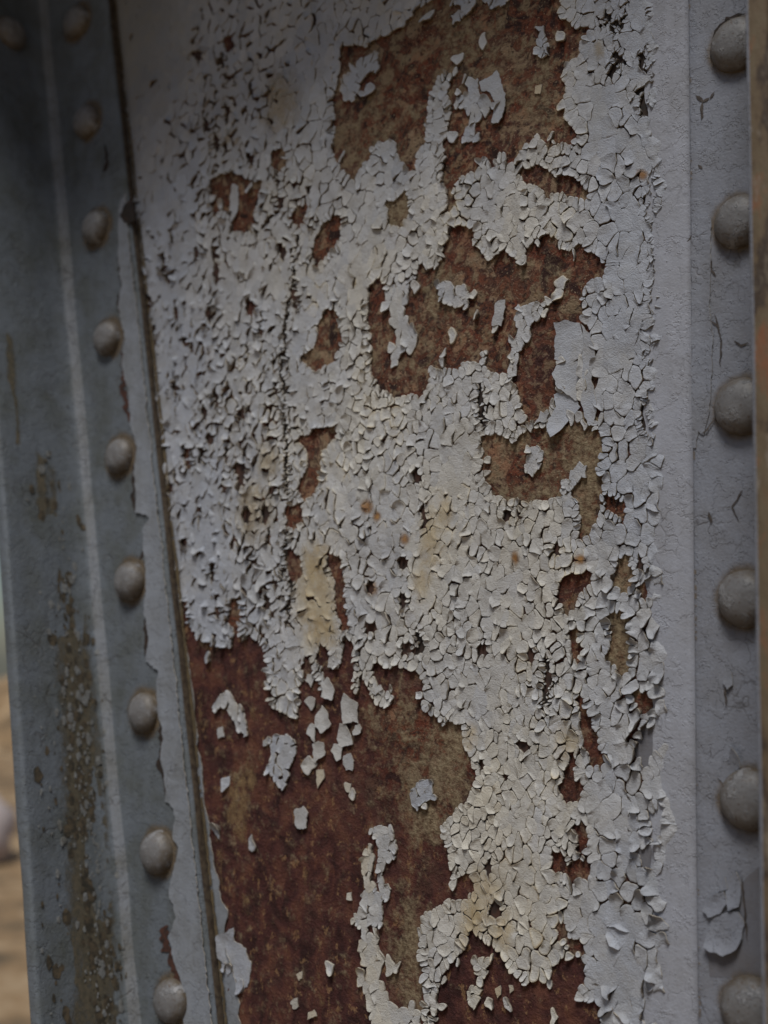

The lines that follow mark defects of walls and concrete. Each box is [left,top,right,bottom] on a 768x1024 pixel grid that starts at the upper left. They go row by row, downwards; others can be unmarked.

rust [333,0,591,212]
crack [600,10,648,117]
rust [386,191,413,227]
crack [272,256,303,495]
crack [477,387,489,431]
rust [368,225,627,541]
peeling [114,0,677,1024]
crack [281,531,295,630]
crack [542,657,559,706]
rust [184,548,606,1024]
crack [159,925,182,984]
peeling [702,867,761,978]